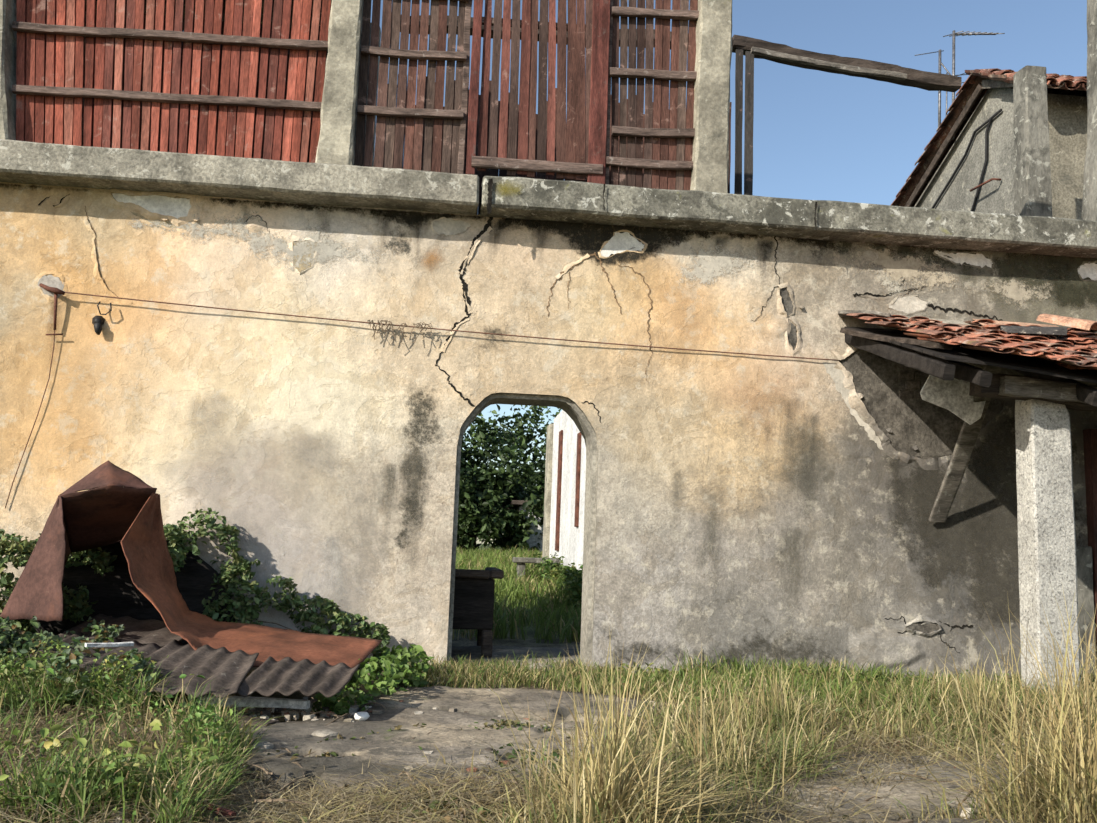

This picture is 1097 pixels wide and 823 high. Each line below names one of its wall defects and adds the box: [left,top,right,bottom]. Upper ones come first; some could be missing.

crack [435,178,493,406]
crack [546,252,653,385]
peeling [598,230,648,259]
crack [752,236,780,321]
peeling [1077,260,1097,282]
water stain [387,392,440,549]
spalling [904,615,942,638]